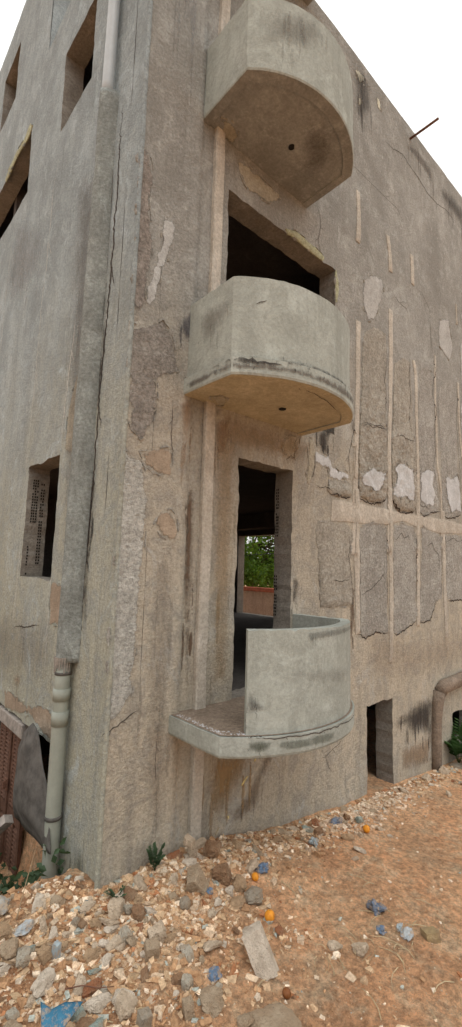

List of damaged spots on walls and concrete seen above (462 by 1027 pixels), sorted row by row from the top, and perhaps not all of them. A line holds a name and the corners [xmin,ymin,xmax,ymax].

crack [80,108,123,643]
peeling [439,319,462,389]
spalling [105,150,180,719]
peeling [305,437,462,514]
water stain [401,700,430,748]